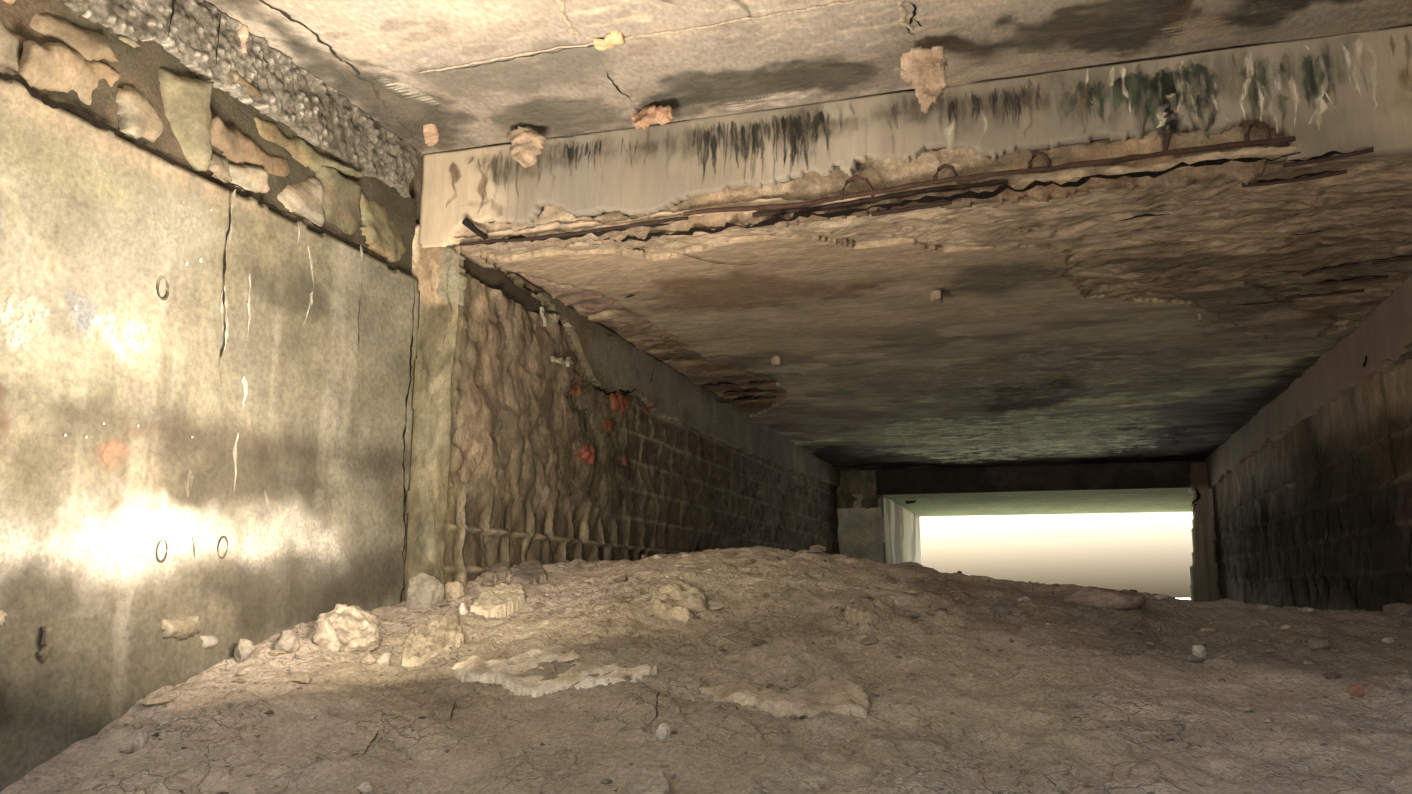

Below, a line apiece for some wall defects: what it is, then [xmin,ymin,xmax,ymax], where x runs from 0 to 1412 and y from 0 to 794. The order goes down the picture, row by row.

crack [425,46,631,100]
leakage [219,0,872,188]
crack [906,2,922,36]
flaking render [900,45,1089,114]
leakage [892,0,1360,143]
leakage [478,160,512,207]
corrosion [459,120,1374,246]
spalling [450,125,1412,416]
leakage [0,510,382,620]